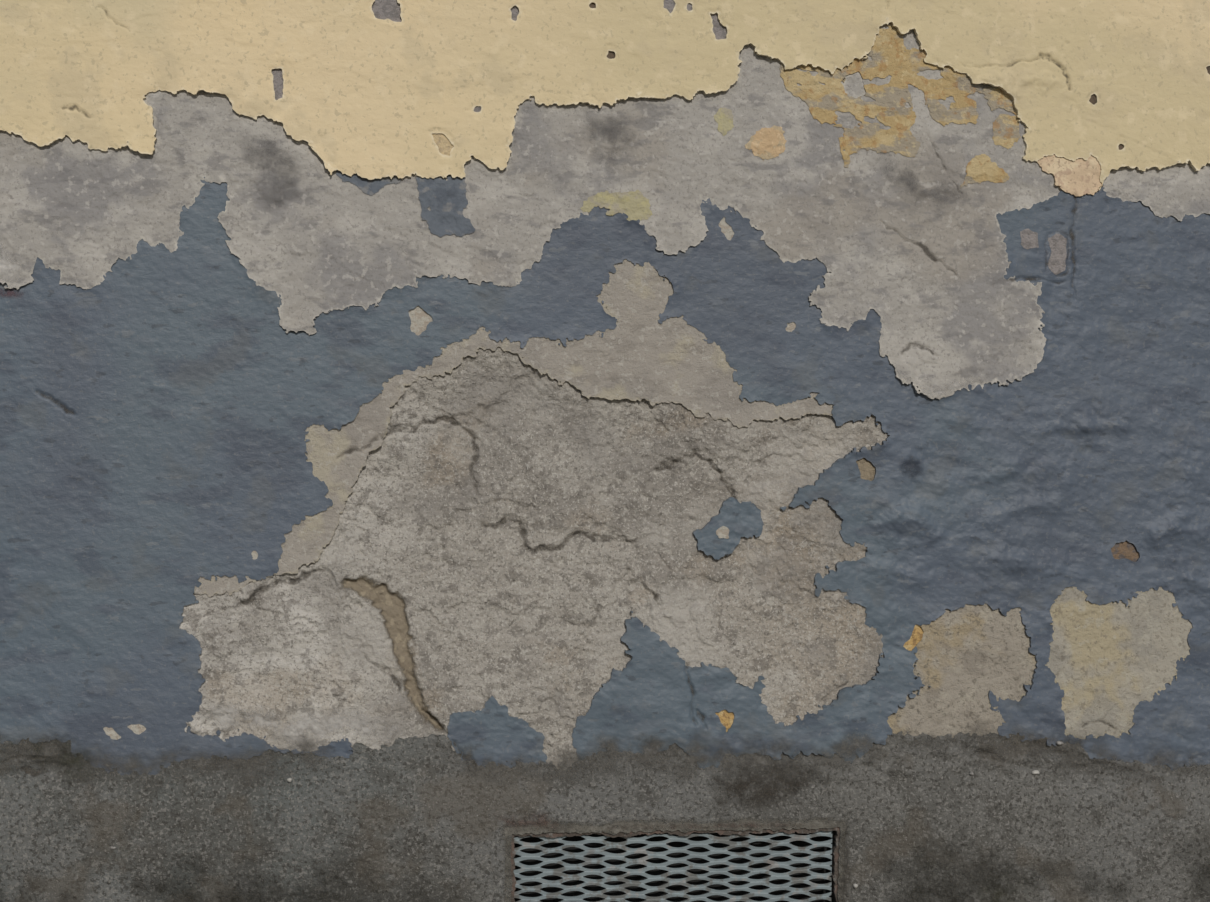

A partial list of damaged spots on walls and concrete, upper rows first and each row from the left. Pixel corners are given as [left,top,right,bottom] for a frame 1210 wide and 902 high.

peeling [710,13,727,40]
peeling [0,23,1210,400]
flaking render [179,259,889,769]
crack [496,520,607,552]
peeling [1111,541,1139,562]
peeling [887,586,1192,739]
peeling [103,724,146,740]